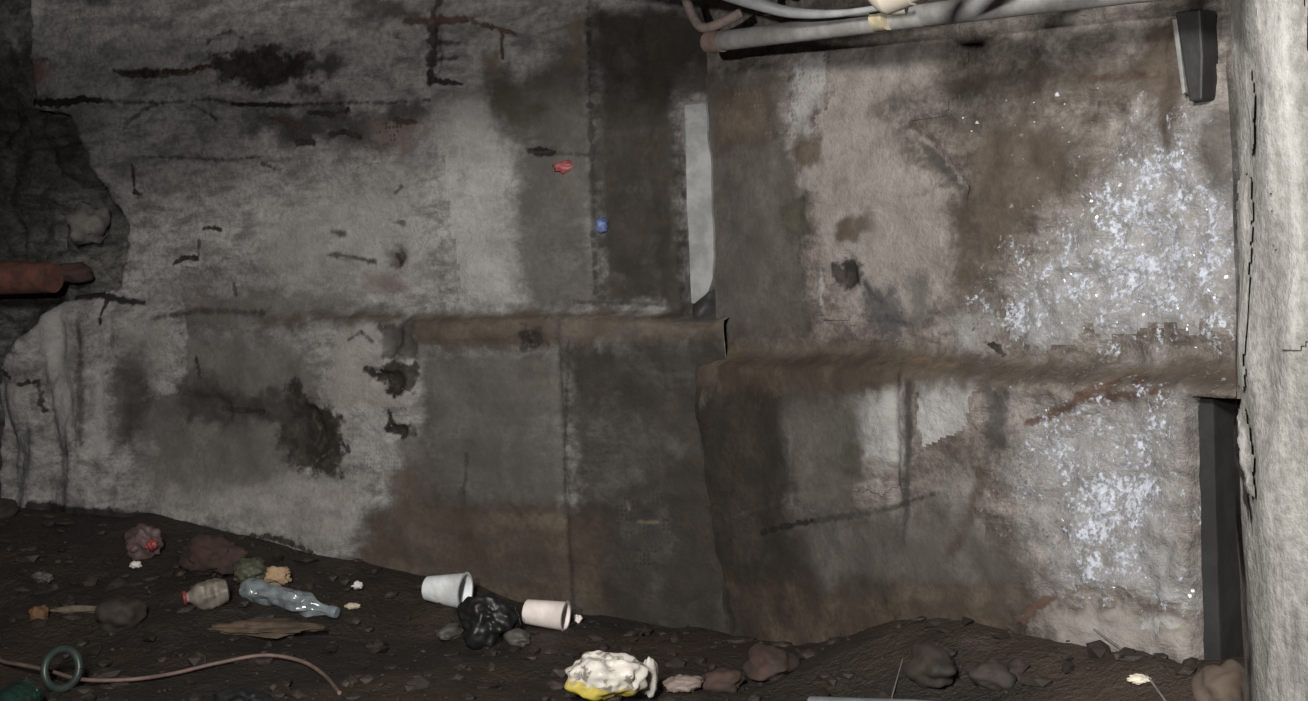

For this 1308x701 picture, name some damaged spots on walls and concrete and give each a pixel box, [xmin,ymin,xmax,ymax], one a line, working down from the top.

spalling [62,201,111,246]
crack [33,95,166,118]
water stain [0,14,597,488]
crack [204,0,463,120]
water stain [390,7,1255,637]
water stain [1255,0,1308,350]
flaking render [112,299,429,560]
crack [1233,390,1255,522]
water stain [1235,494,1251,701]